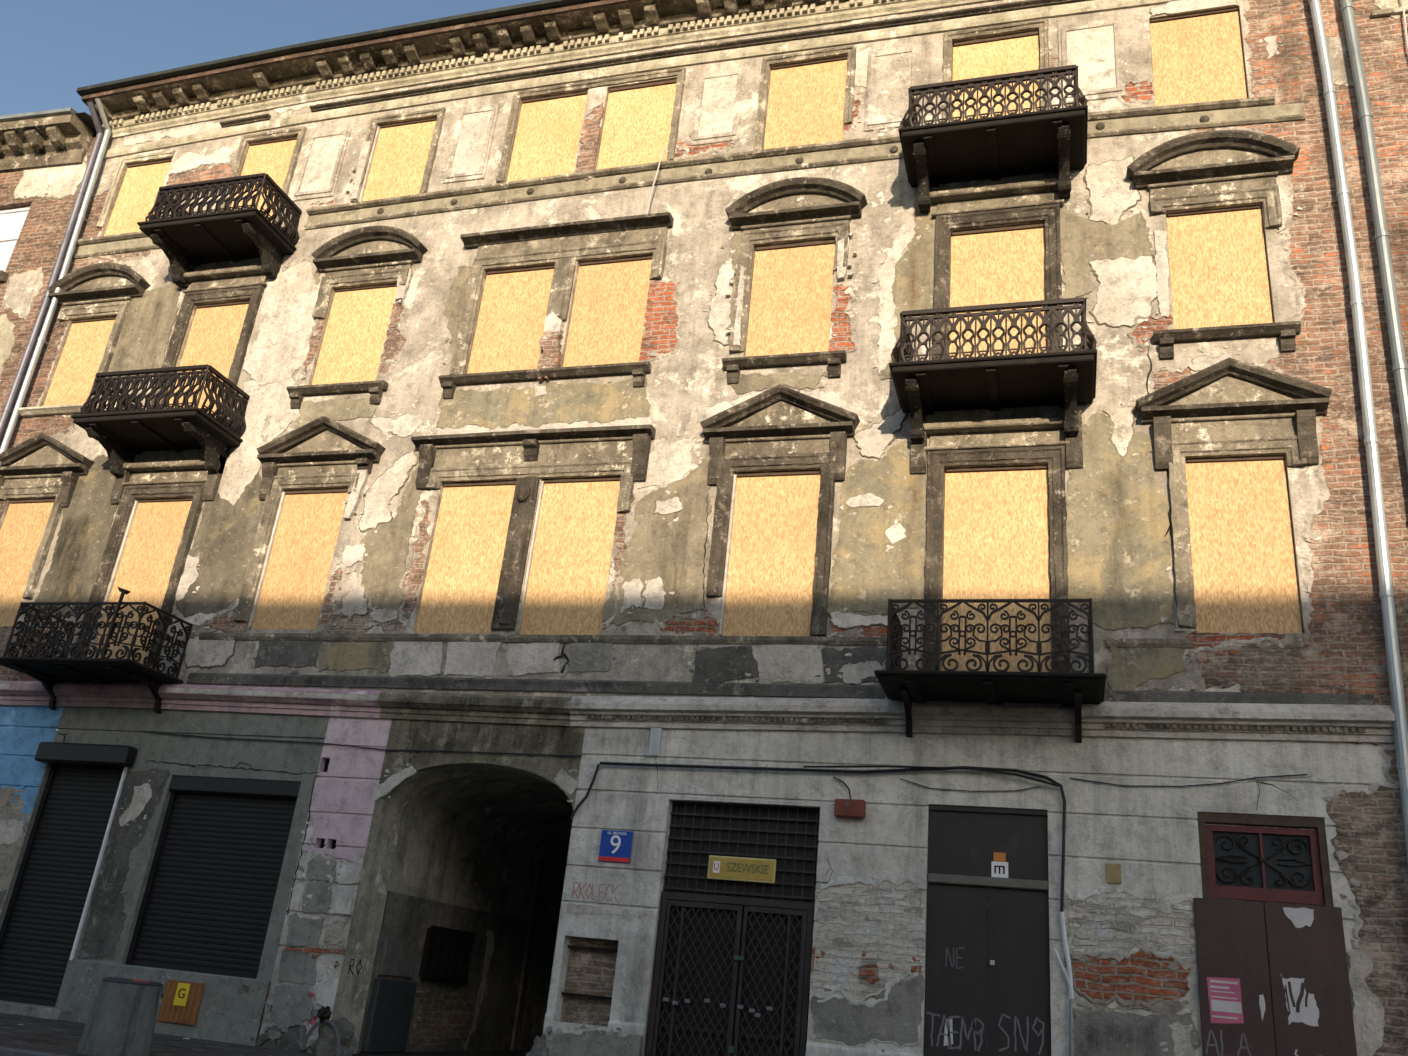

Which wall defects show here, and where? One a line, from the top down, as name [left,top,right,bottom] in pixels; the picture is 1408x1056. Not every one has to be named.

peeling [1083,156,1142,225]
spalling [0,152,152,460]
spalling [639,280,686,363]
peeling [703,245,745,347]
peeling [873,197,921,376]
peeling [1103,403,1139,460]
peeling [1085,230,1173,352]
spalling [1149,0,1408,721]
spalling [175,386,909,685]
peeling [0,785,38,916]
spalling [810,871,926,1052]
spalling [1058,884,1201,1056]